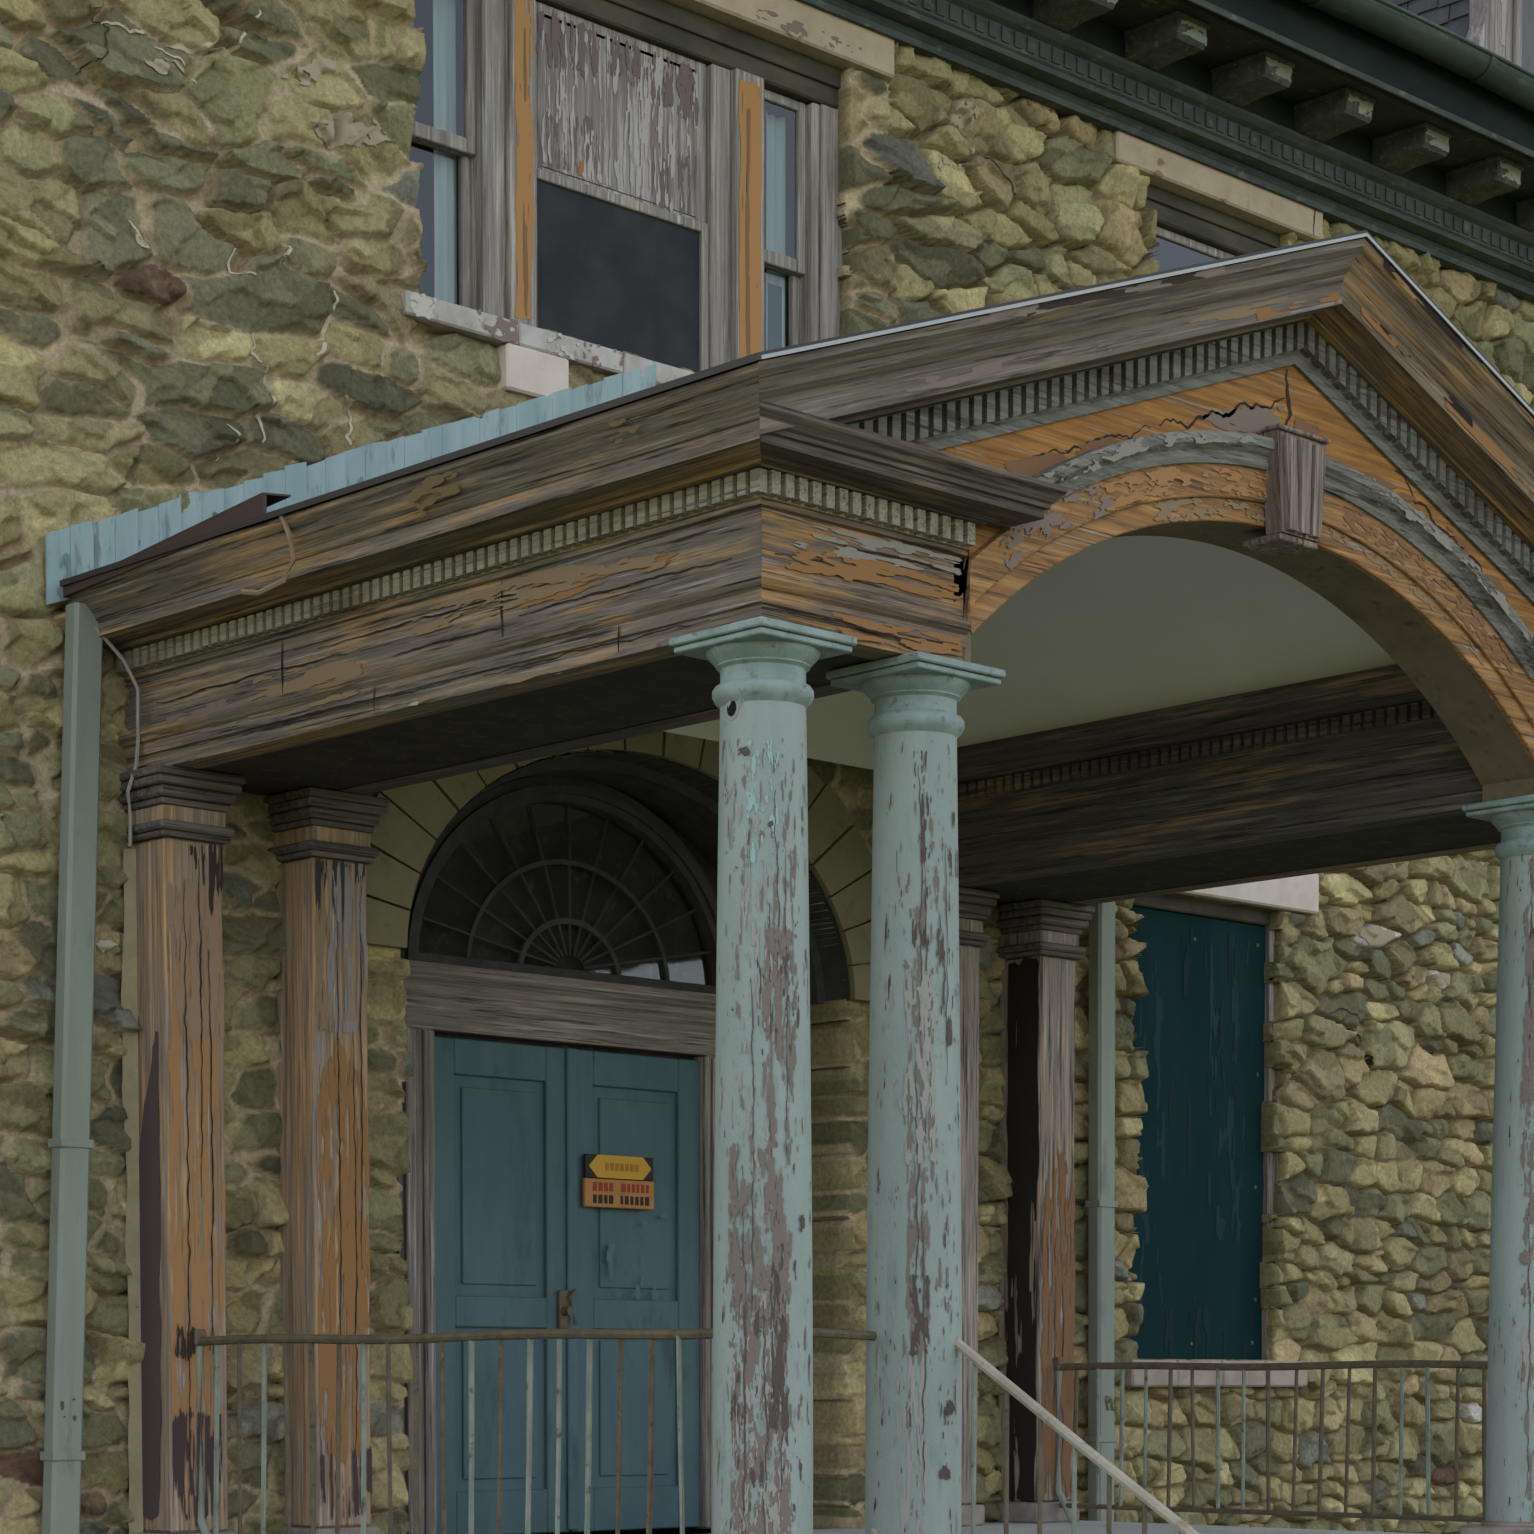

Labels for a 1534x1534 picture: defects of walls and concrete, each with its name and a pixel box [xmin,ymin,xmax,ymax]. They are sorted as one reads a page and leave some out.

peeling [515,0,701,320]
peeling [167,873,226,1468]
peeling [316,861,370,1465]
peeling [716,698,812,1534]
peeling [872,738,961,1534]
peeling [1041,1147,1075,1498]
peeling [1491,854,1534,1522]